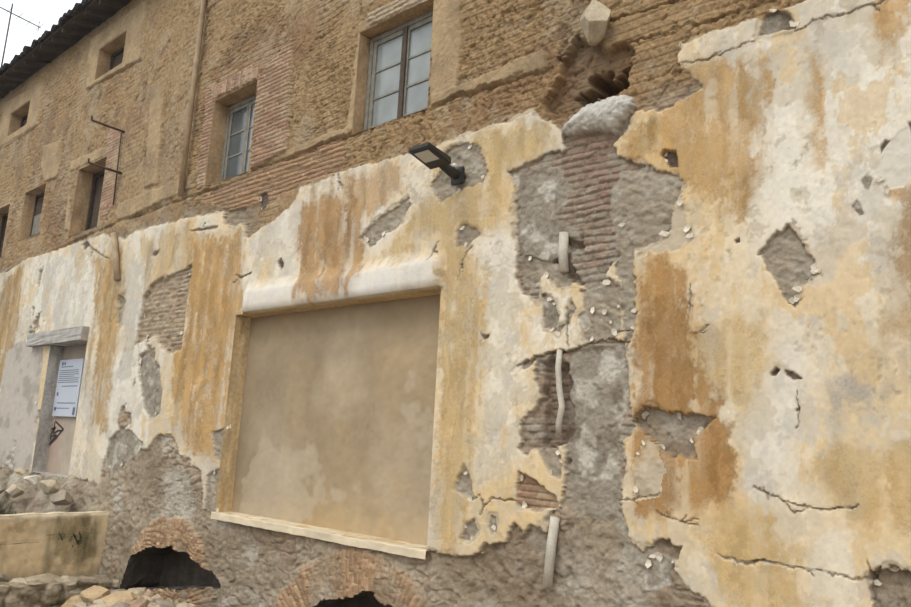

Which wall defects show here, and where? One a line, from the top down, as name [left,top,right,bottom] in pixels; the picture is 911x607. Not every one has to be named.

crack [678,40,756,65]
crack [794,0,886,32]
spalling [759,225,821,307]
damp [893,188,911,280]
damp [0,267,22,382]
spalling [135,265,192,352]
damp [141,227,243,456]
flaking render [505,94,714,592]
spalling [138,352,162,417]
spalling [105,427,143,470]
crack [753,485,859,514]
crack [715,552,880,584]